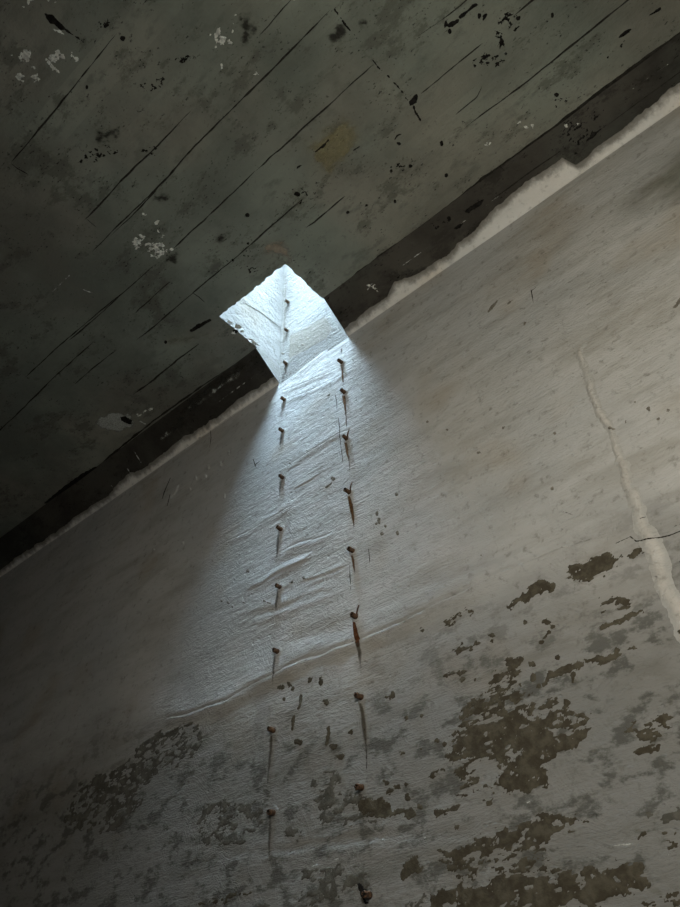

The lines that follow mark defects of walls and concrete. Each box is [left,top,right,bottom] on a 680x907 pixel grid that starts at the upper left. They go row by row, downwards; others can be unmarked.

crack [617,517,680,543]
peeling [566,548,644,582]
peeling [506,579,556,611]
peeling [599,596,644,631]
rust [353,622,361,661]
peeling [452,633,495,655]
peeling [277,682,303,746]
peeling [429,646,637,818]
peeling [624,713,673,755]
peeling [310,726,423,828]
peeling [400,855,423,881]
peeling [405,806,680,907]